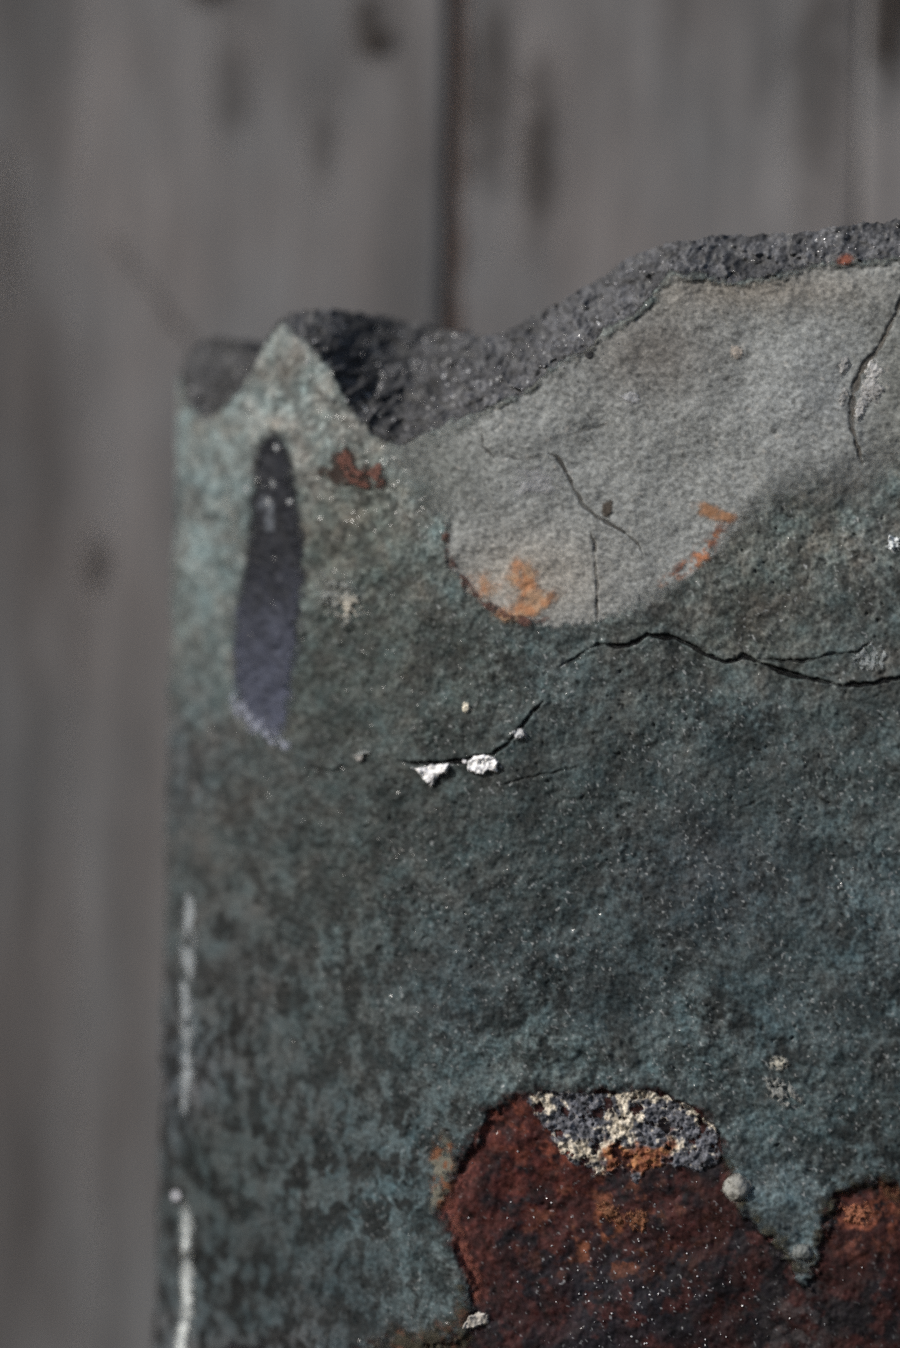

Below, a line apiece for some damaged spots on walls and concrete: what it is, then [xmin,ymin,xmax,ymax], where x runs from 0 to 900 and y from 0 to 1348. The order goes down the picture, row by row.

crack [179,218,900,458]
rust [317,445,386,489]
spalling [404,260,900,628]
rust [442,531,552,625]
rust [673,503,733,574]
crack [552,454,900,687]
crack [313,750,370,772]
crack [404,701,543,786]
rust [391,1085,900,1348]